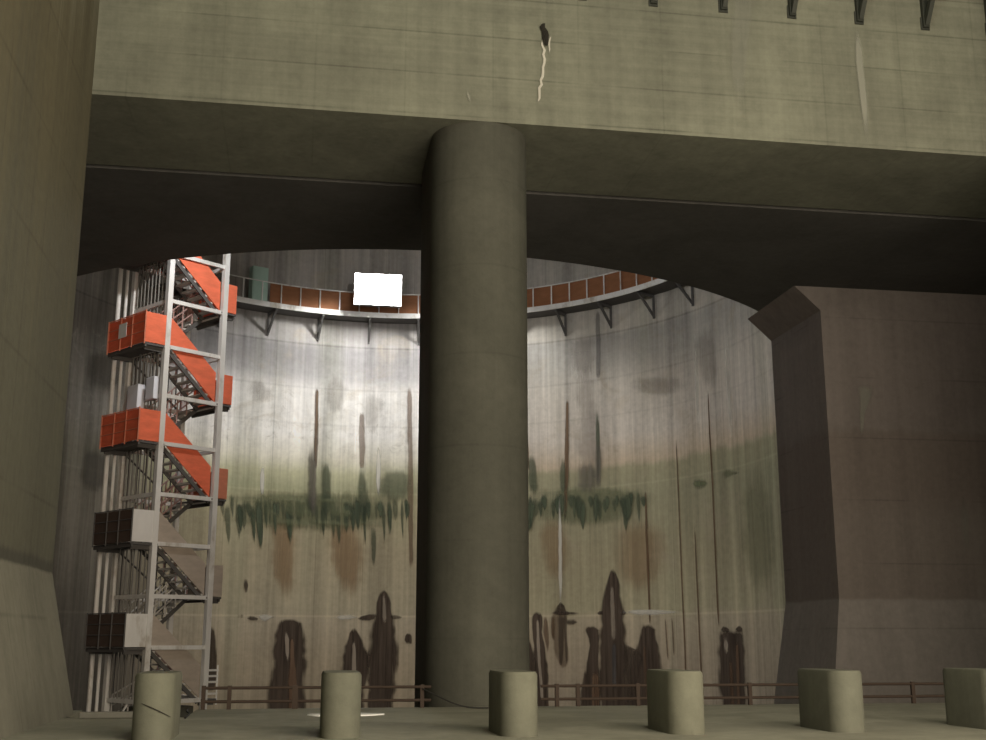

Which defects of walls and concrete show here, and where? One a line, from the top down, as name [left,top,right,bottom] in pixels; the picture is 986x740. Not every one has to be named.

crack [538,23,549,100]
corrosion [544,603,576,663]